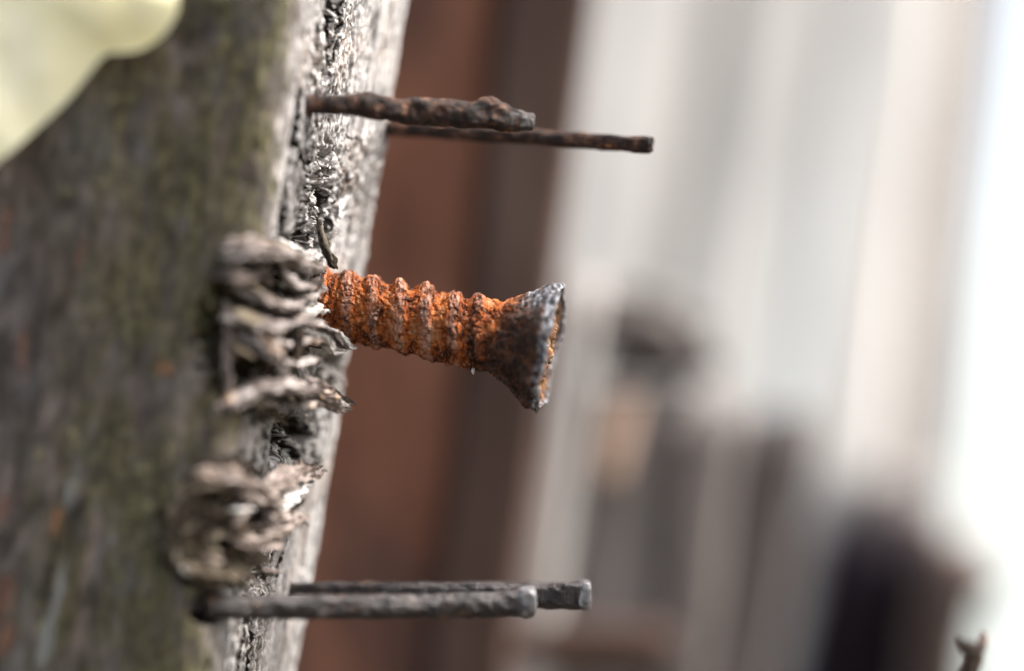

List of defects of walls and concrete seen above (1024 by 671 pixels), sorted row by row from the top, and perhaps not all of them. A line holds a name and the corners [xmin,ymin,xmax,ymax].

peeling [315,353,347,395]
peeling [265,414,327,470]